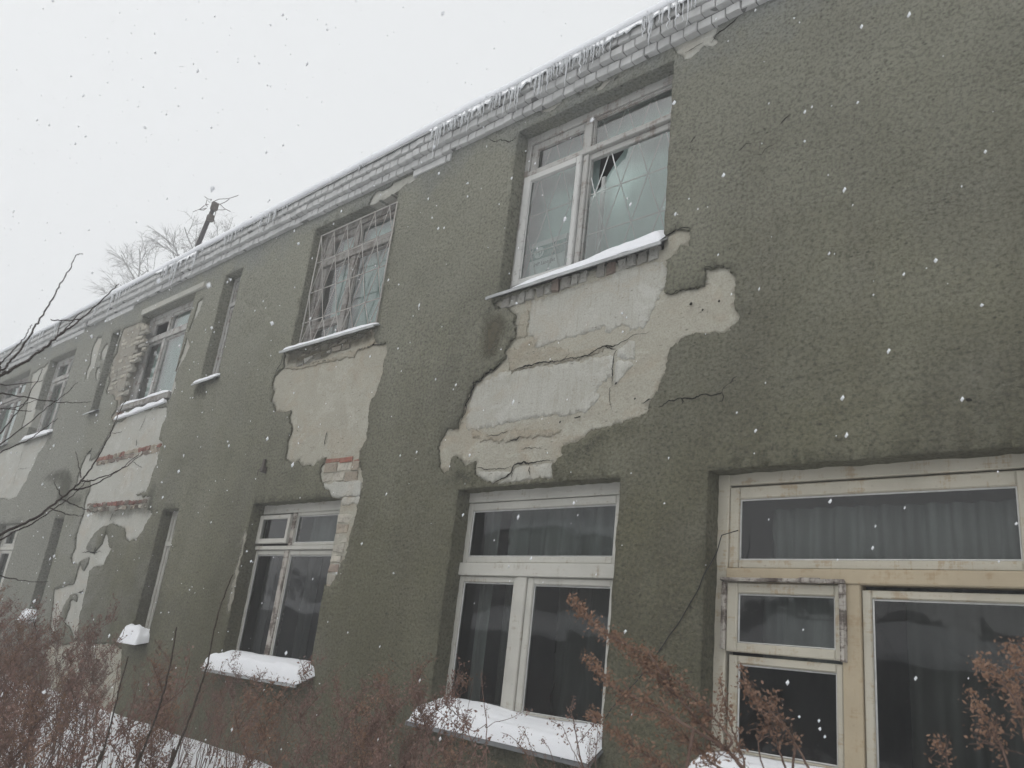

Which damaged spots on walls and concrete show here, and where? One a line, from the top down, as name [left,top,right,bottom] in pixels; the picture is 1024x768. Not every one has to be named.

flaking render [0,364,50,499]
flaking render [44,322,190,712]
flaking render [272,329,387,586]
crack [478,431,553,484]
crack [460,333,646,425]
flaking render [438,229,740,485]
crack [643,376,737,407]